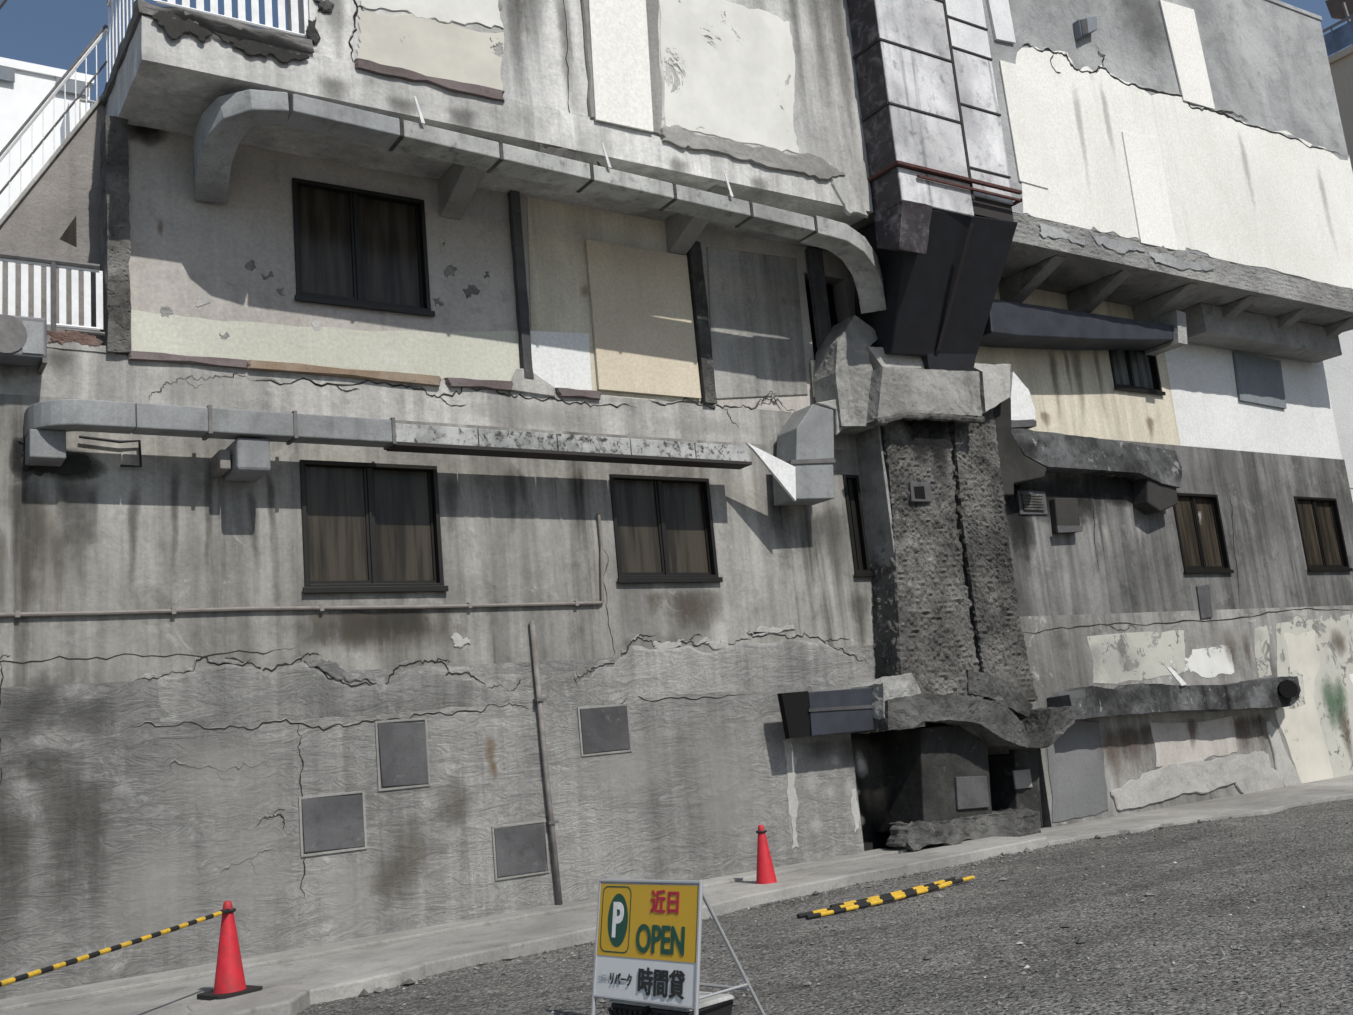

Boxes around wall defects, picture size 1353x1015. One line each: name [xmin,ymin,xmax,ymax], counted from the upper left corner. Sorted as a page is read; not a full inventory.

peeling [152,0,335,64]
peeling [357,0,505,90]
peeling [659,0,845,181]
spalling [1039,224,1215,271]
peeling [160,304,174,318]
peeling [462,271,490,314]
crack [149,373,795,424]
peeling [1087,630,1234,684]
peeling [1110,614,1353,811]
crack [0,648,528,906]